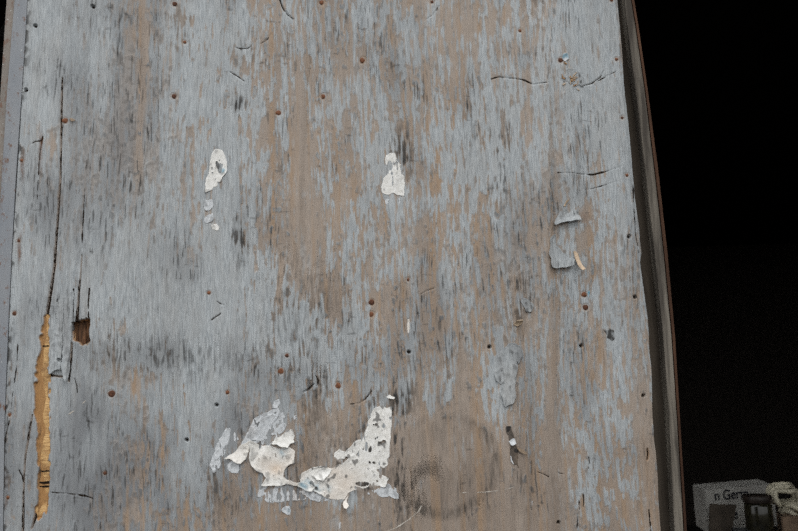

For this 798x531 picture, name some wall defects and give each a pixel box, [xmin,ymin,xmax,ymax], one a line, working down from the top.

crack [33,77,90,324]
peeling [204,149,227,231]
peeling [381,153,405,205]
peeling [549,199,586,270]
crack [557,168,616,189]
peeling [210,395,399,515]